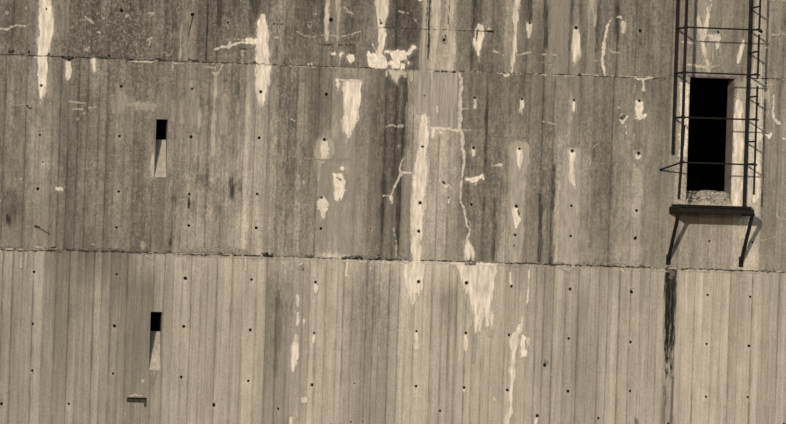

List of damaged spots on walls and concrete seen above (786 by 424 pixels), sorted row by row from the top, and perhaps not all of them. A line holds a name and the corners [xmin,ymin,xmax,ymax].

water stain [37,0,54,118]
water stain [214,0,272,106]
efflorescence [372,0,408,54]
crack [760,21,785,37]
crack [1,0,665,265]
water stain [314,77,362,255]
water stain [394,0,460,329]
water stain [507,139,530,267]
water stain [450,240,499,363]
crack [495,261,657,269]
crack [677,266,785,274]
efflorescence [504,316,531,424]